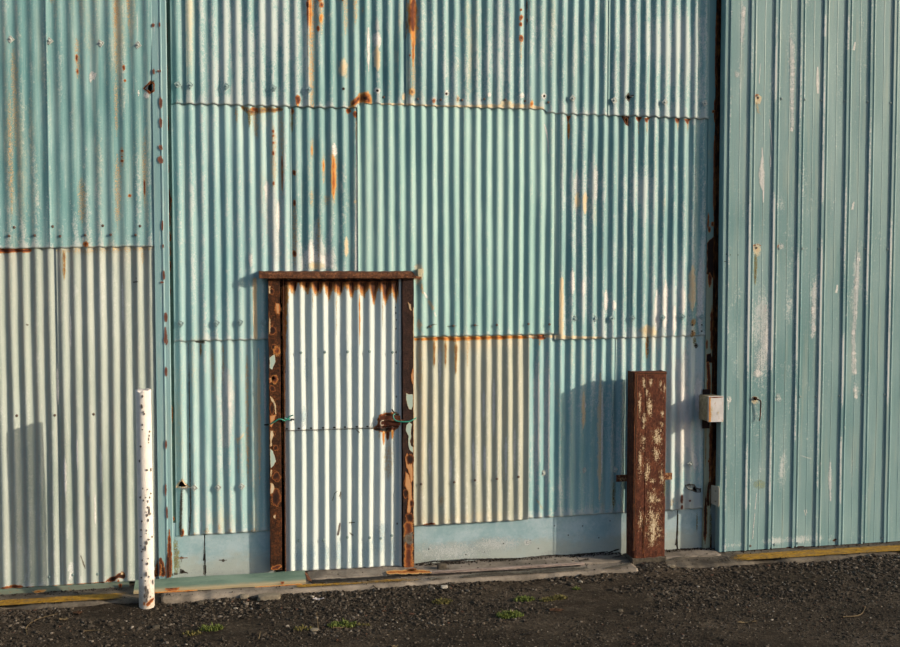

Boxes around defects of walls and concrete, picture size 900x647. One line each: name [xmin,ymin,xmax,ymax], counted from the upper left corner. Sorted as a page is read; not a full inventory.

rust [342,0,364,35]
rust [405,0,419,96]
rust [234,0,326,197]
rust [345,91,372,134]
rust [309,139,338,205]
rust [271,278,401,447]
rust [373,412,401,478]